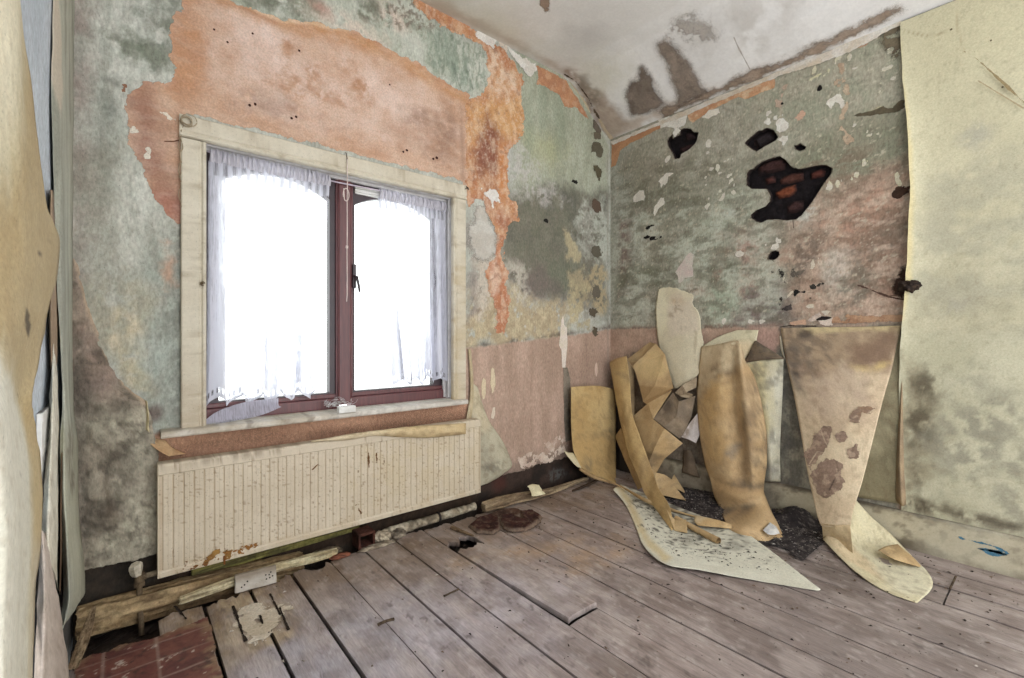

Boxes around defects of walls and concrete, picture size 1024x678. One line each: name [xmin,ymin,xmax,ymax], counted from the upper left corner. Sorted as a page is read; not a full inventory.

peeling [122,0,588,334]
spalling [611,21,901,223]